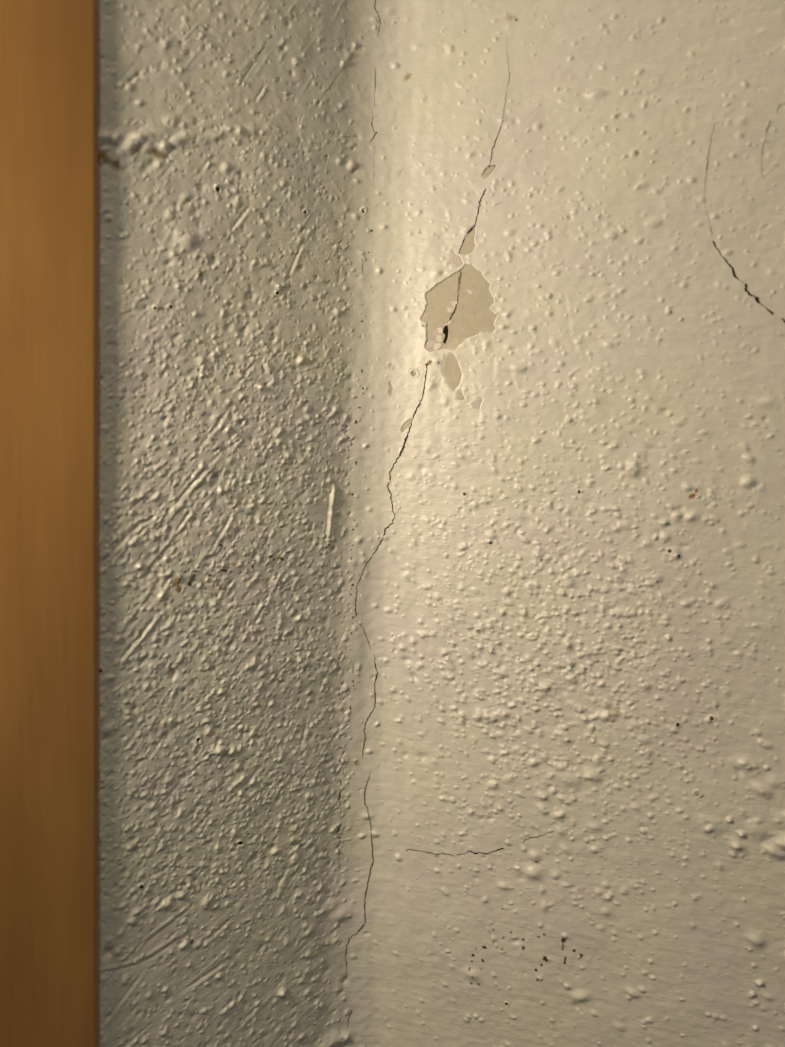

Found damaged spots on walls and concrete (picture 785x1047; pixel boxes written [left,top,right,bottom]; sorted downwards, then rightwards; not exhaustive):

crack [459,189,486,253]
peeling [421,227,496,410]
crack [713,241,785,323]
crack [336,366,427,974]
crack [406,831,554,856]